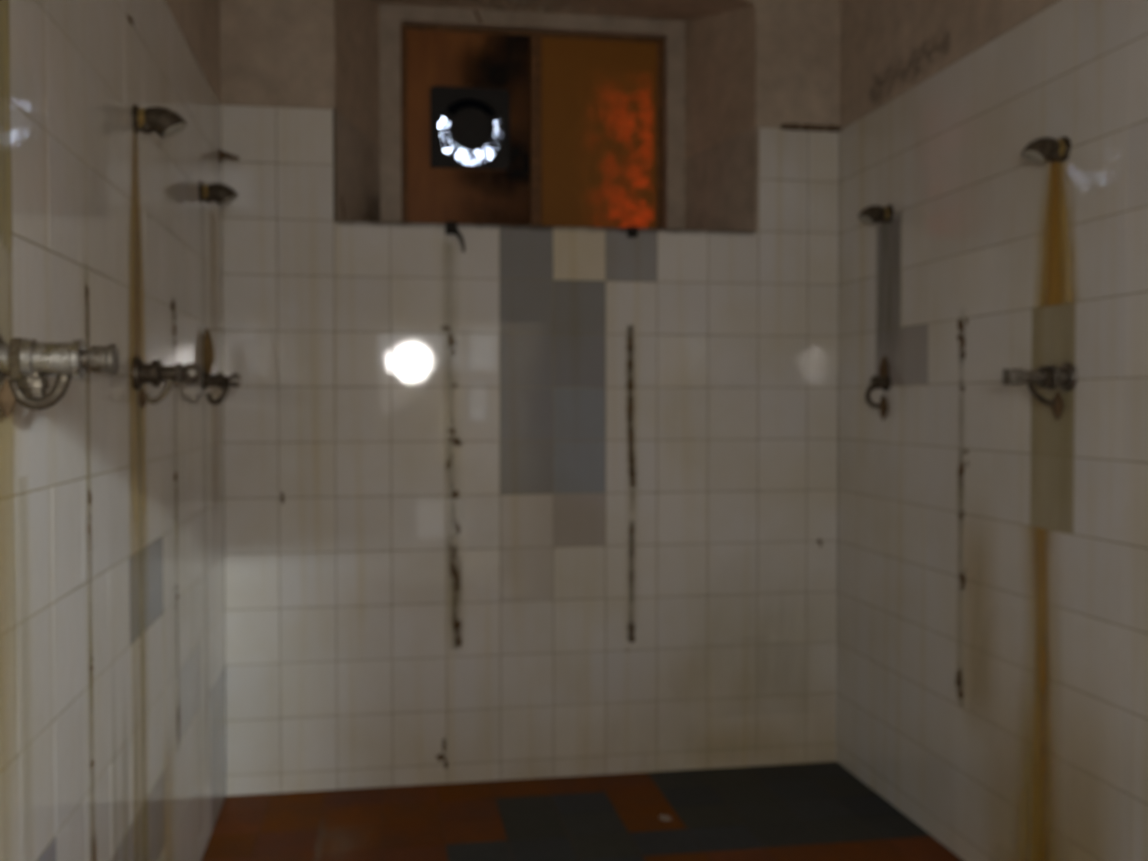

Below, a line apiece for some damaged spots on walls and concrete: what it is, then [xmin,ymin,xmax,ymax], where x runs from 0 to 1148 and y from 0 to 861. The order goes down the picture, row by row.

corrosion [0,0,12,250]
corrosion [1041,161,1072,307]
crack [83,284,91,341]
corrosion [130,155,147,463]
crack [440,326,456,356]
crack [957,318,968,392]
crack [86,488,94,540]
crack [446,418,463,592]
crack [627,327,636,652]
crack [88,650,96,690]
crack [453,620,462,647]
crack [955,669,964,706]